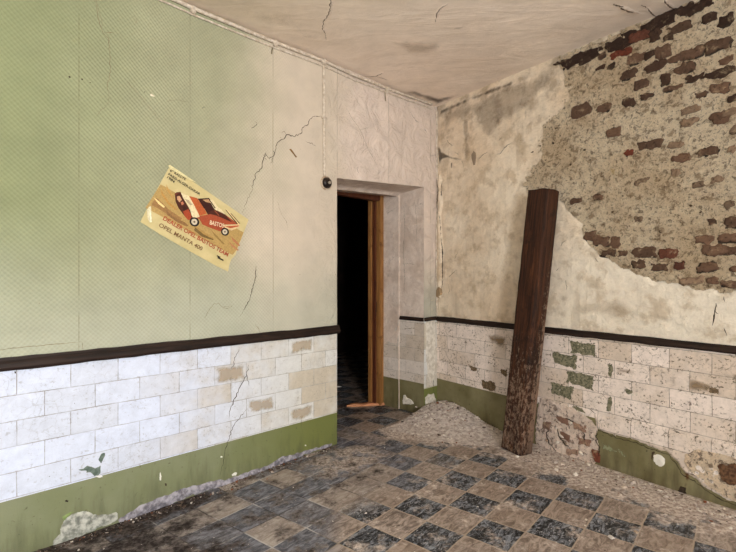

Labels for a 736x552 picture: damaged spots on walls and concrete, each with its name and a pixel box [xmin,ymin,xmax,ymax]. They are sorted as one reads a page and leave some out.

crack [321,0,334,39]
crack [242,115,322,213]
flaking render [523,0,736,294]
crack [221,347,249,468]
flaking render [535,341,736,505]
flaking render [53,443,332,545]